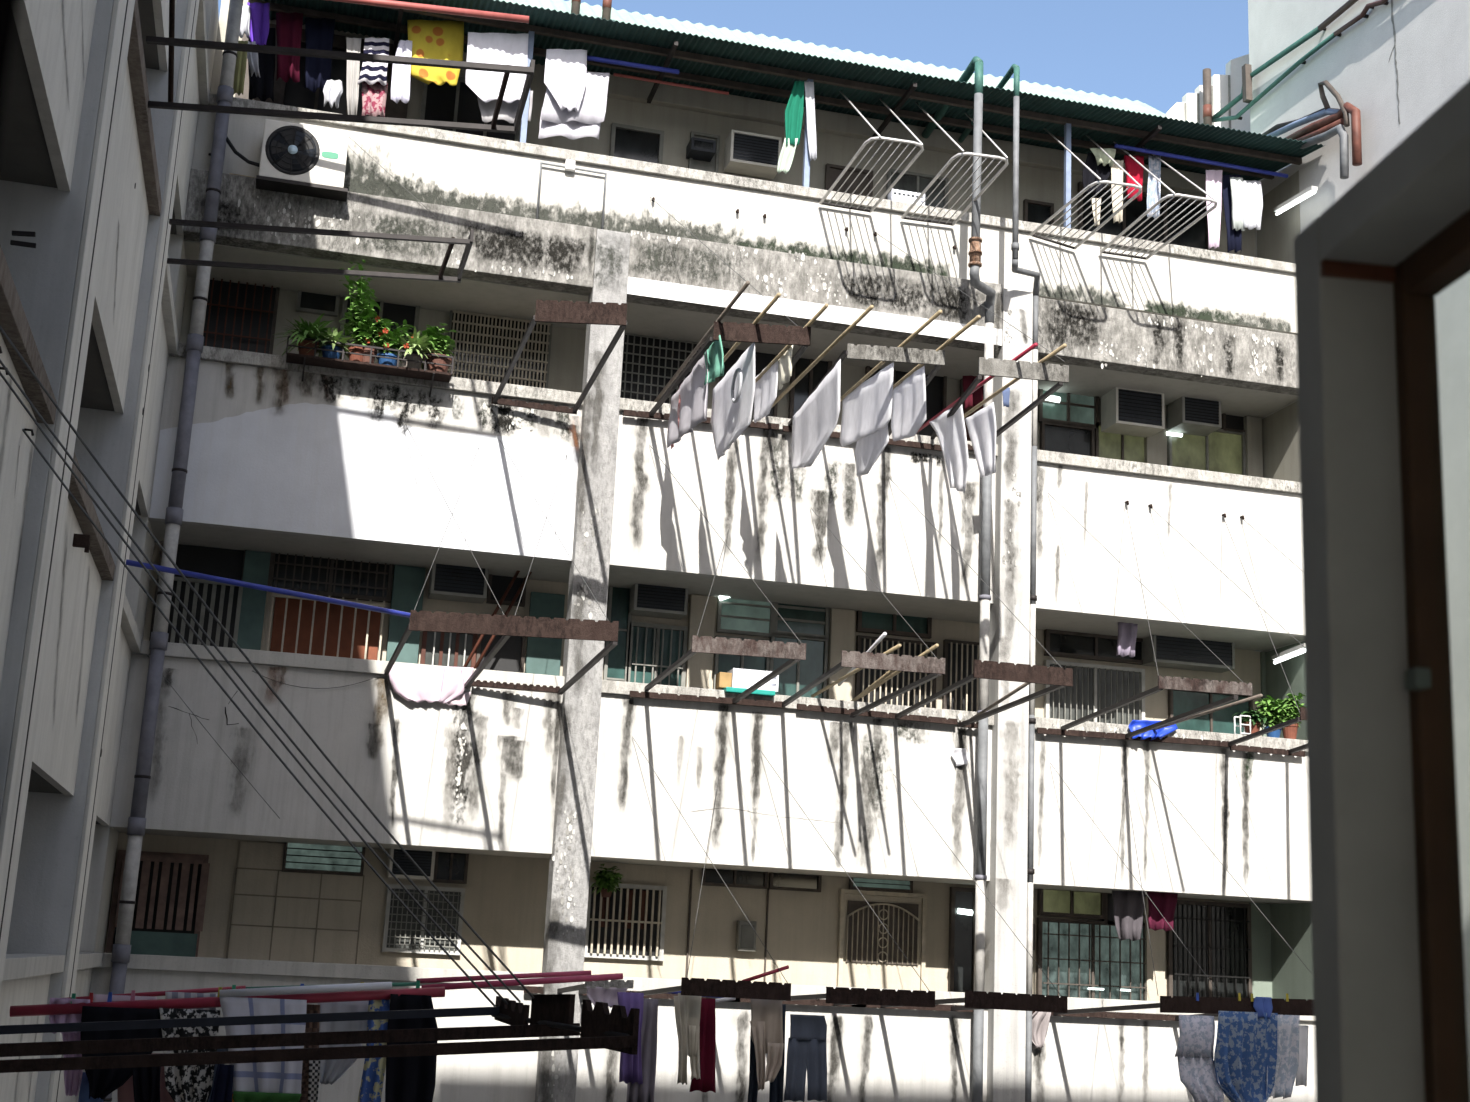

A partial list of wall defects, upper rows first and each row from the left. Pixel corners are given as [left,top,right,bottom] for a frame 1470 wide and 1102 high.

water stain [344,155,978,319]
water stain [1023,284,1126,346]
water stain [1144,301,1291,381]
water stain [478,357,602,512]
water stain [632,417,648,540]
water stain [758,429,855,560]
water stain [876,445,890,566]
water stain [450,692,484,822]
water stain [698,706,728,836]
water stain [752,713,762,796]
water stain [1221,748,1253,873]
water stain [951,1017,959,1101]